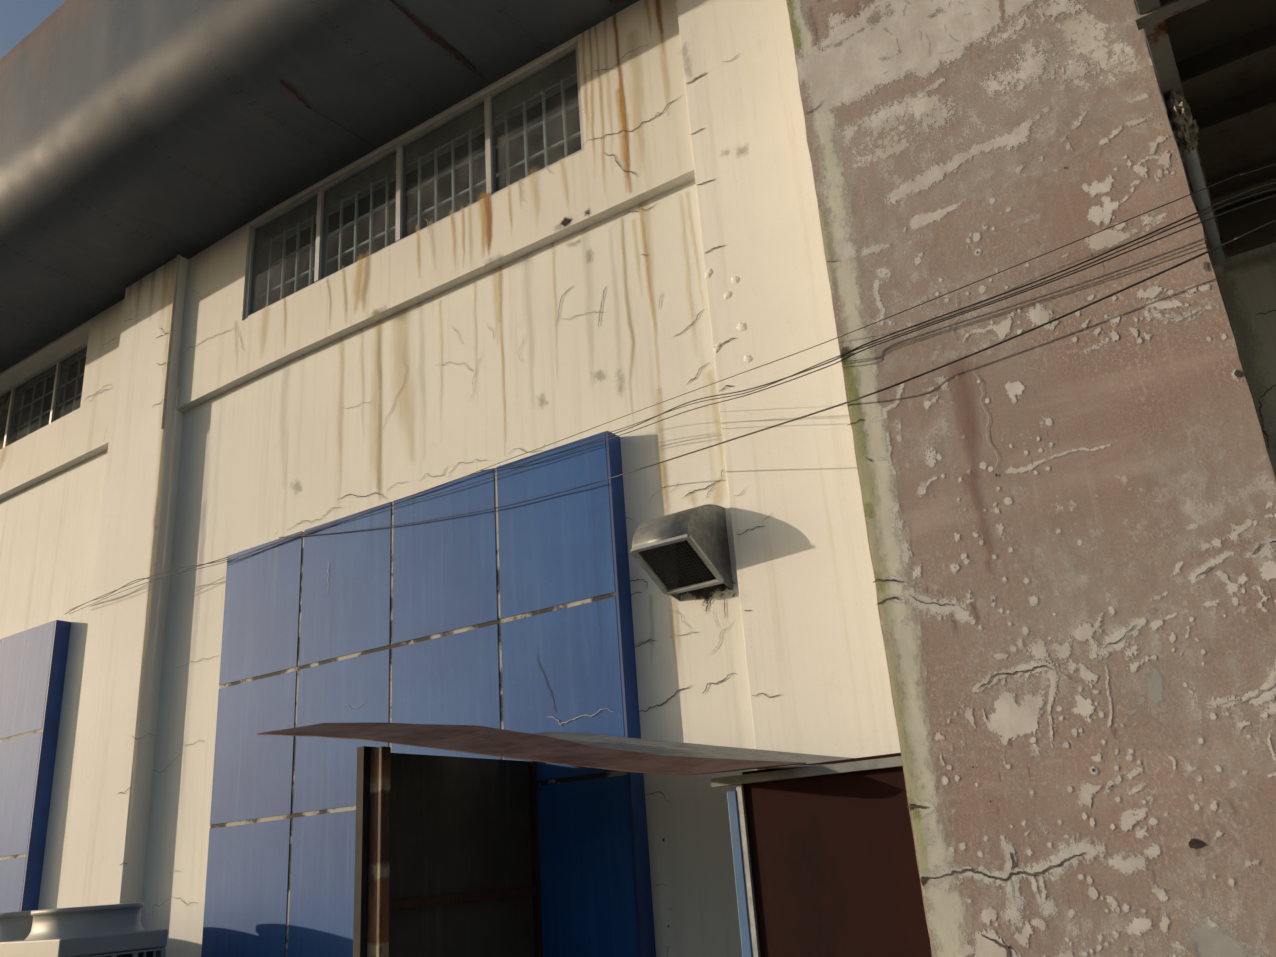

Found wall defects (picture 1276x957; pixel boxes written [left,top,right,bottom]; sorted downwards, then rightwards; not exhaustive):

rust [613,14,628,176]
crack [582,73,704,177]
water stain [819,211,831,285]
crack [556,287,606,327]
crack [686,338,735,391]
crack [1254,385,1276,449]
water stain [840,347,885,626]
peeling [791,0,1276,957]
crack [535,598,780,725]
crack [920,852,1086,903]
crack [981,934,1010,957]